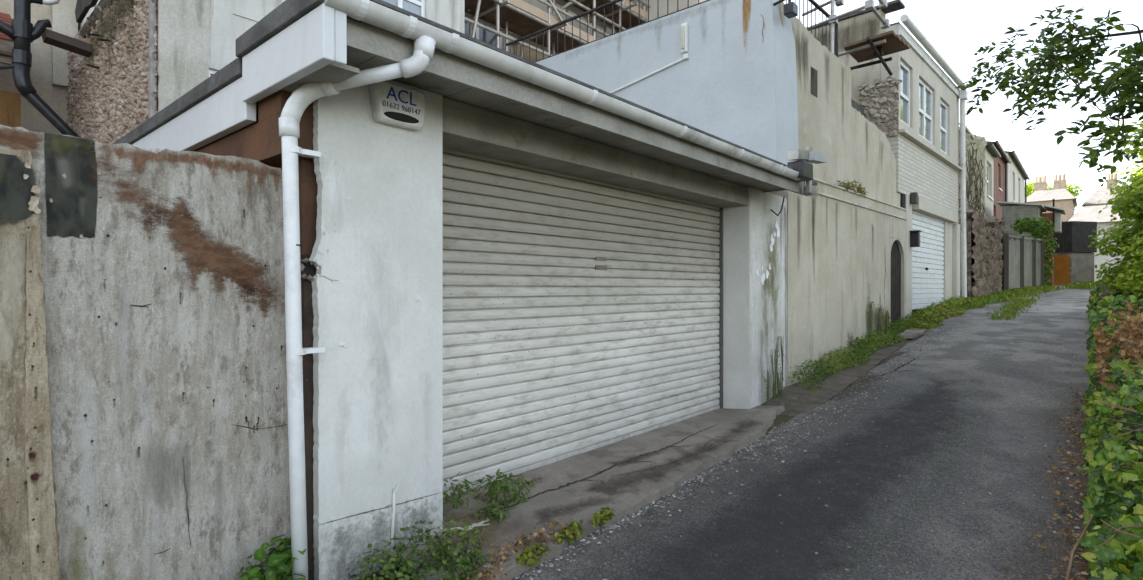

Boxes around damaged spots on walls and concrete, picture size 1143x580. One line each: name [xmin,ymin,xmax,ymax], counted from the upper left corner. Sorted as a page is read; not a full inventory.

water stain [0,128,42,156]
corrosion [91,146,280,312]